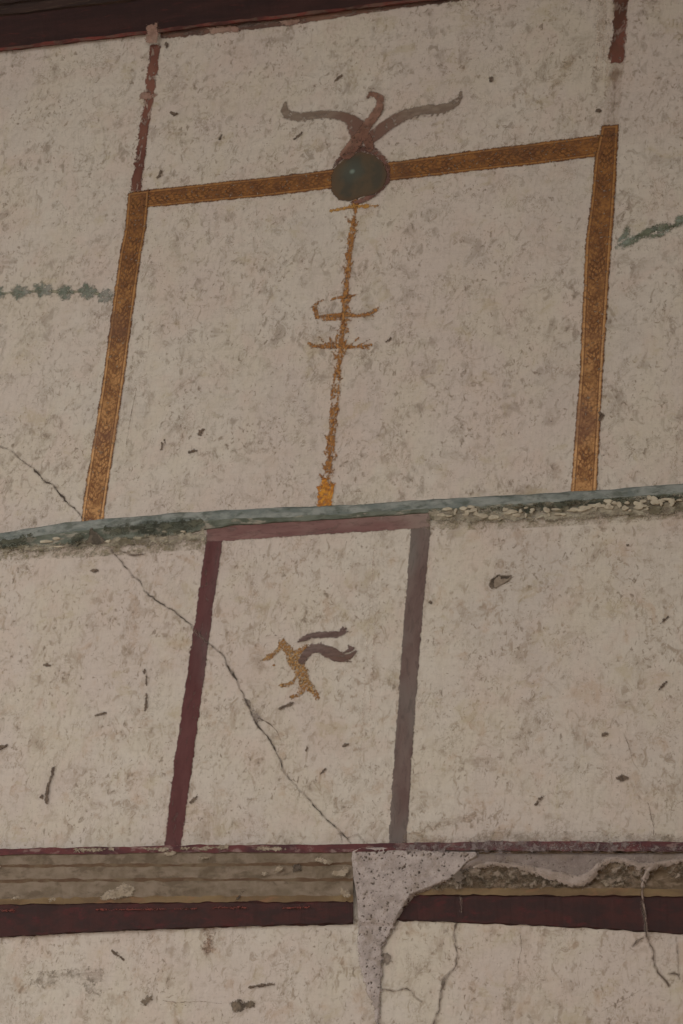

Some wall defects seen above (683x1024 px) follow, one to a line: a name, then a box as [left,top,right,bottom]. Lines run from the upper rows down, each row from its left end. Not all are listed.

peeling [427,494,683,523]
crack [0,446,351,843]
crack [433,870,465,1024]
crack [633,870,680,987]